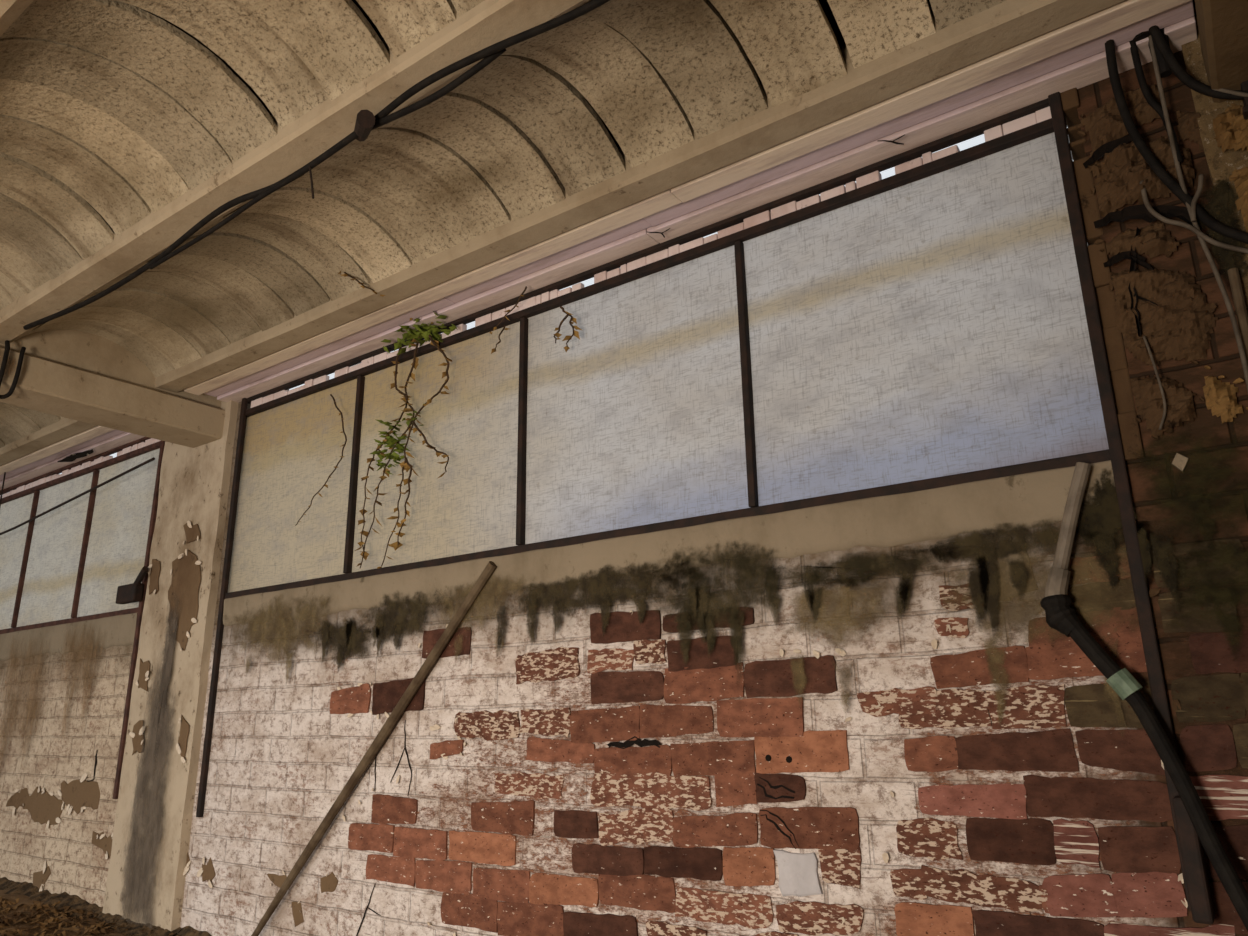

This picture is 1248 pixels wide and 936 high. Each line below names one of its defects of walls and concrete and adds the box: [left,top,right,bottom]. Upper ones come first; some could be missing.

peeling [147,521,202,651]
damp [236,521,1062,722]
damp [1067,470,1181,624]
peeling [6,773,100,829]
peeling [92,831,113,860]
damp [120,610,179,929]
peeling [330,539,1248,936]